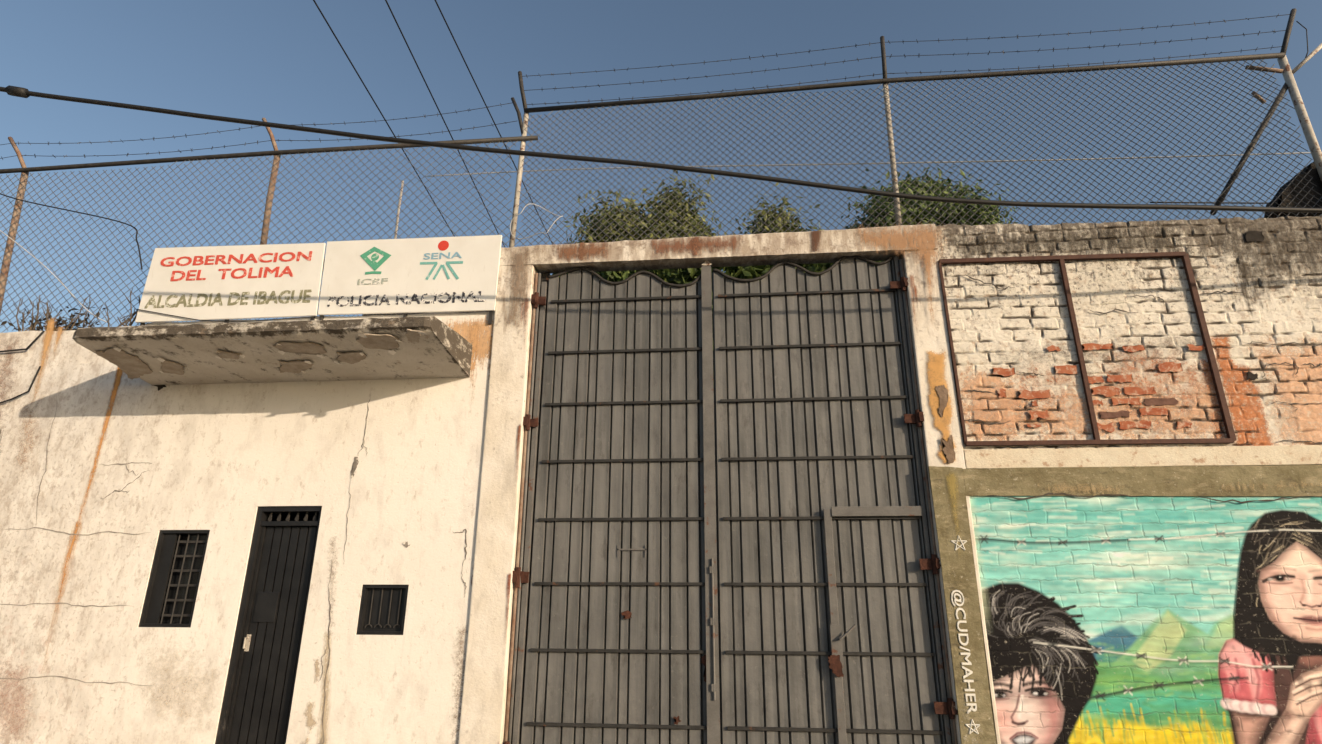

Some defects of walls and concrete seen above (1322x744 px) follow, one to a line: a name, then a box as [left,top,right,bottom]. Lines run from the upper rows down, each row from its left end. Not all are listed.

damp [859,227,938,312]
damp [958,226,1179,257]
damp [1211,221,1322,311]
crack [5,408,152,535]
rust [86,367,123,495]
peeling [95,347,188,391]
peeling [273,329,428,374]
peeling [927,336,1322,463]
crack [2,601,128,609]
rust [60,513,81,594]
crack [318,400,370,744]
crack [0,676,147,686]